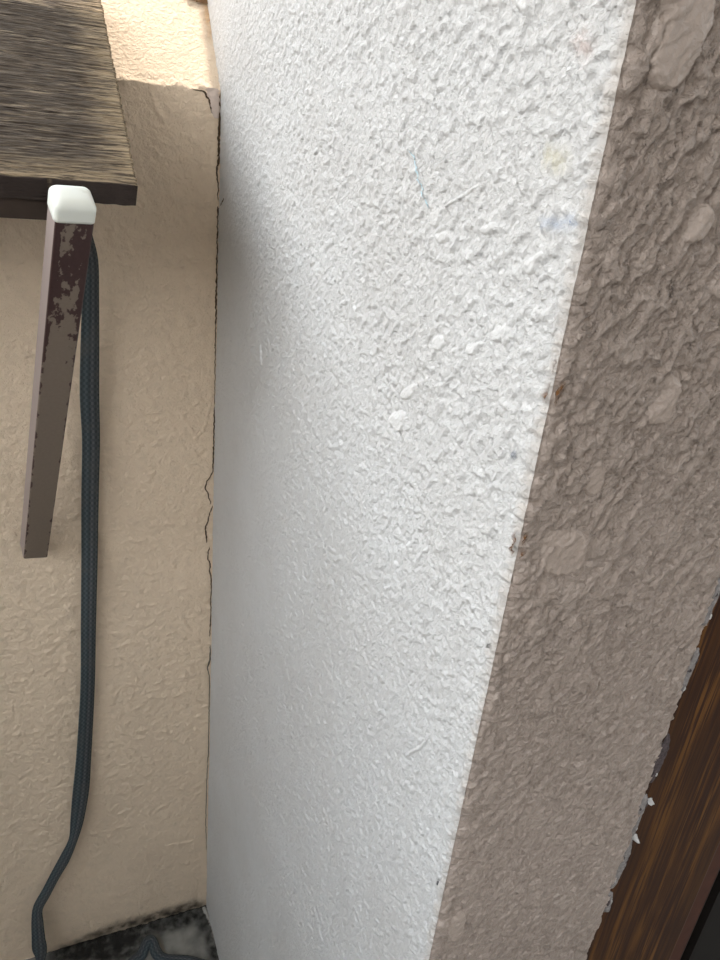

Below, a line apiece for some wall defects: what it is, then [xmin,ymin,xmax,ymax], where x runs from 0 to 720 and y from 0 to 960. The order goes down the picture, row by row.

crack [193,89,224,848]
peeling [681,648,699,693]
peeling [604,733,670,912]